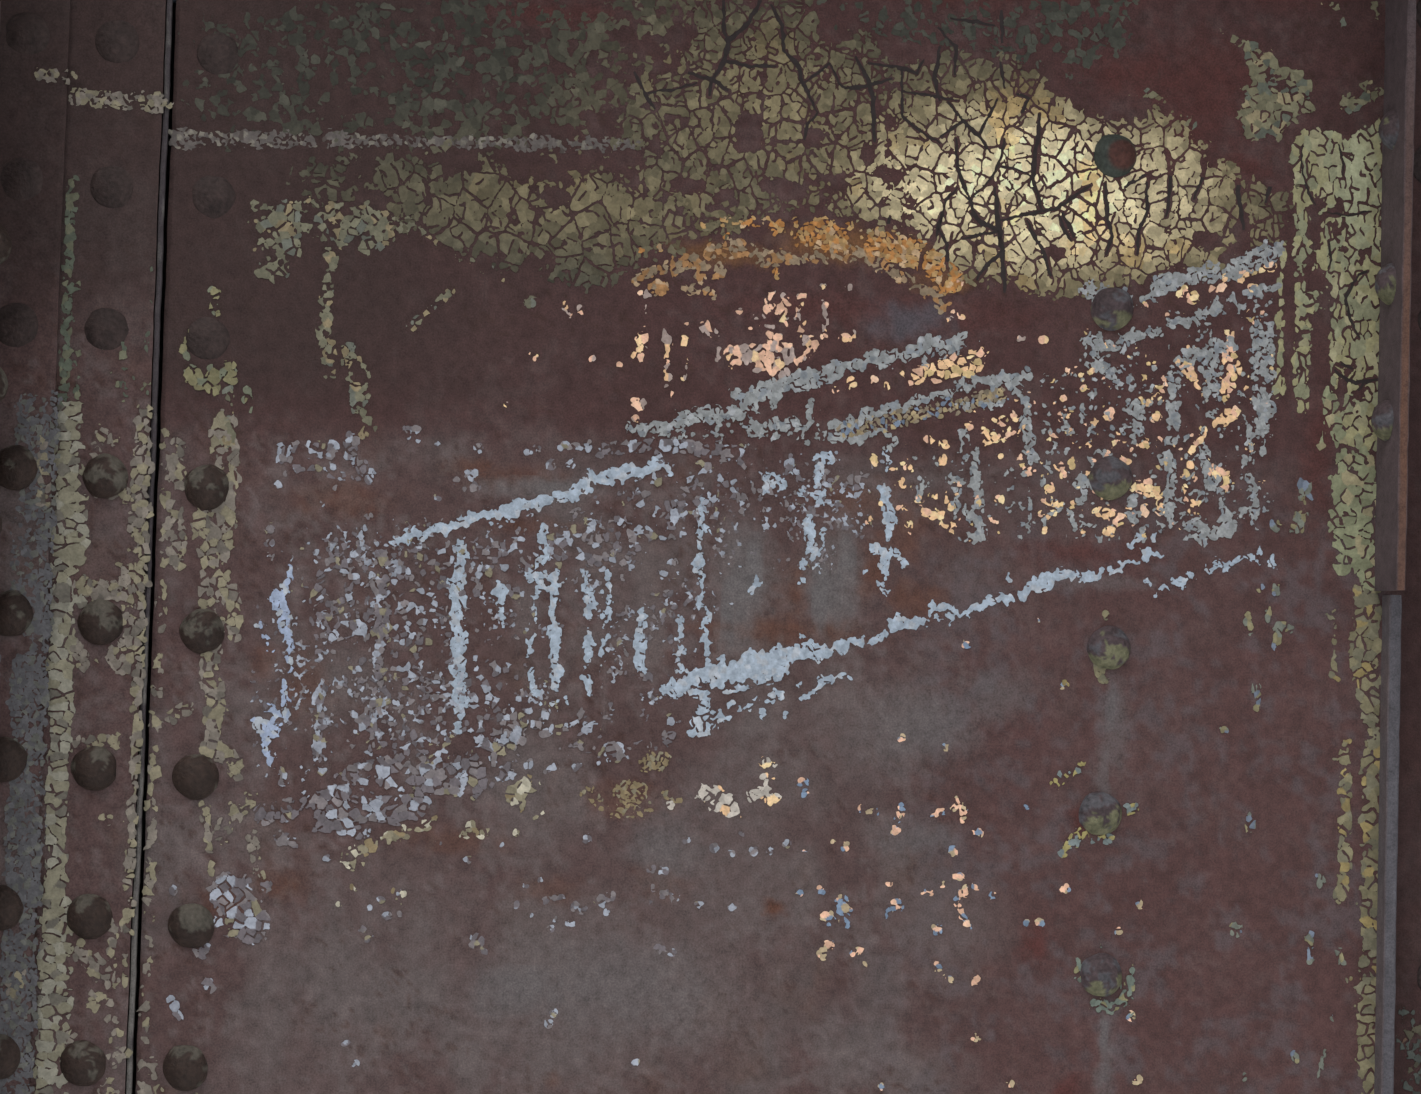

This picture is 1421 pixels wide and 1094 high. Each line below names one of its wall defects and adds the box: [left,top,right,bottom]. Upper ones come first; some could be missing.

crack [633,0,1378,391]
peeling [276,247,377,491]
peeling [661,320,718,396]
corrosion [268,450,637,543]
peeling [869,483,909,597]
corrosion [789,468,1197,654]
peeling [1143,546,1276,598]
corrosion [1291,356,1342,559]
peeling [0,175,253,1094]
corrosion [241,630,347,739]
peeling [661,756,782,818]
corrosion [387,817,602,915]